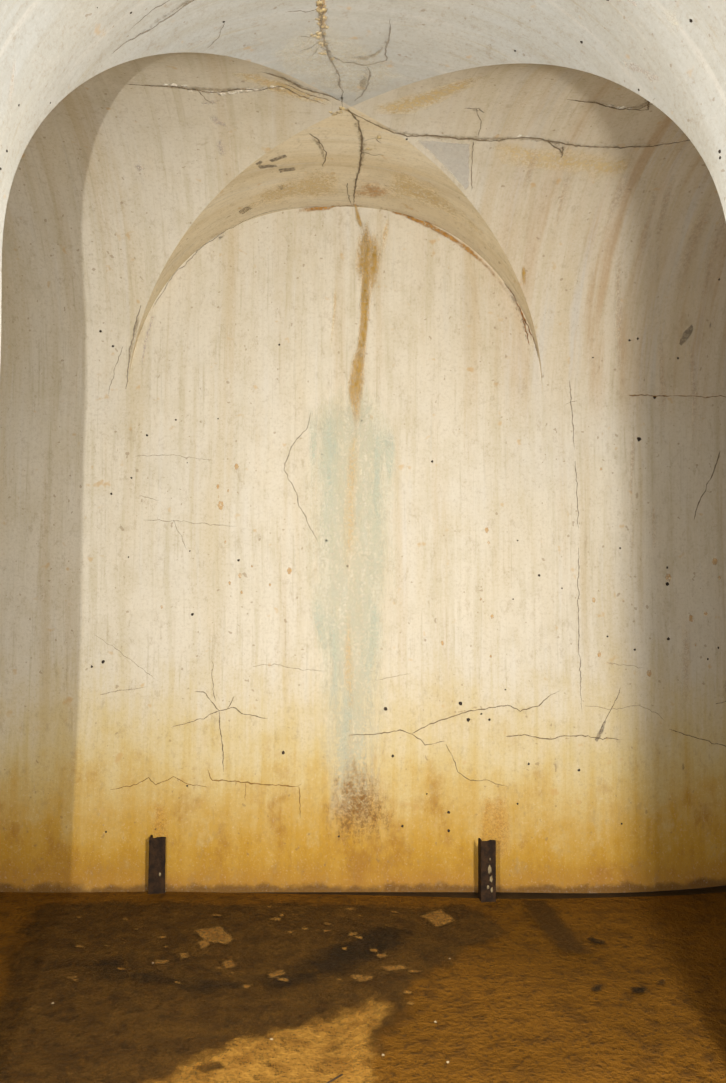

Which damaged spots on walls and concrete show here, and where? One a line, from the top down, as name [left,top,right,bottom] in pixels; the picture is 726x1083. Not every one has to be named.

crack [112,0,194,54]
efflorescence [310,0,335,61]
crack [129,0,689,202]
corrosion [305,176,446,412]
corrosion [394,212,494,275]
crack [629,392,725,400]
leakage [313,403,392,832]
crack [353,388,620,786]
crack [111,662,301,812]